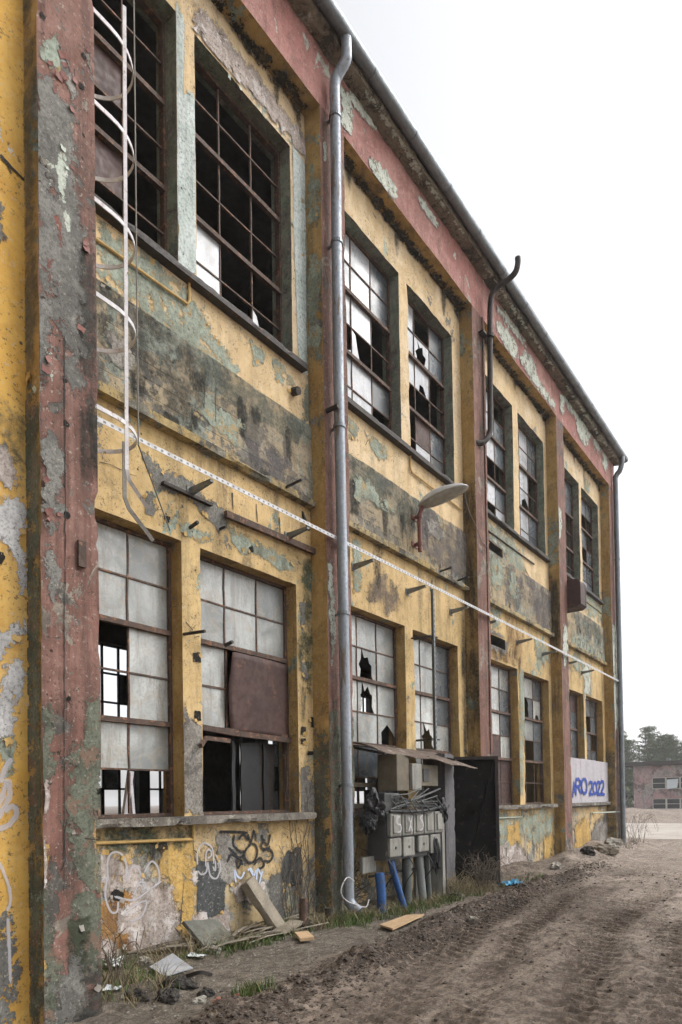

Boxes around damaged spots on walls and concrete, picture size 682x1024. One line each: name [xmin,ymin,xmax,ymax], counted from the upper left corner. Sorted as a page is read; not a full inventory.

spalling [340,85,464,234]
damp [79,251,305,480]
peeling [483,264,615,475]
peeling [0,34,137,1024]
peeling [142,451,298,574]
damp [350,461,480,757]
damp [505,564,560,654]
damp [45,917,103,1024]
spalling [96,833,252,960]